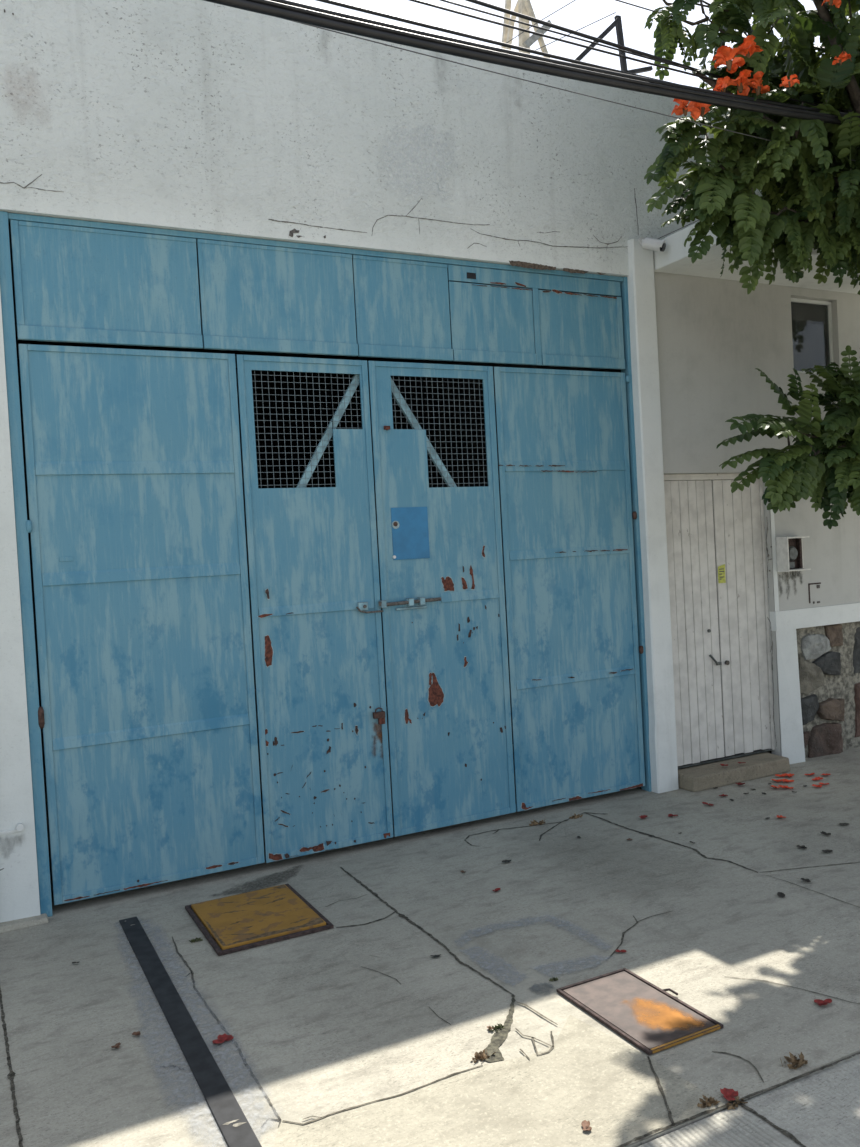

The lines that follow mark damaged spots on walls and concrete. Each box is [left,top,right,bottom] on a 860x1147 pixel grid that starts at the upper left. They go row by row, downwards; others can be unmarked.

crack [268,188,639,250]
crack [465,812,858,907]
crack [328,867,558,1059]
crack [607,911,671,959]
crack [0,988,23,1147]
crack [172,936,483,1128]
crack [617,1051,860,1147]